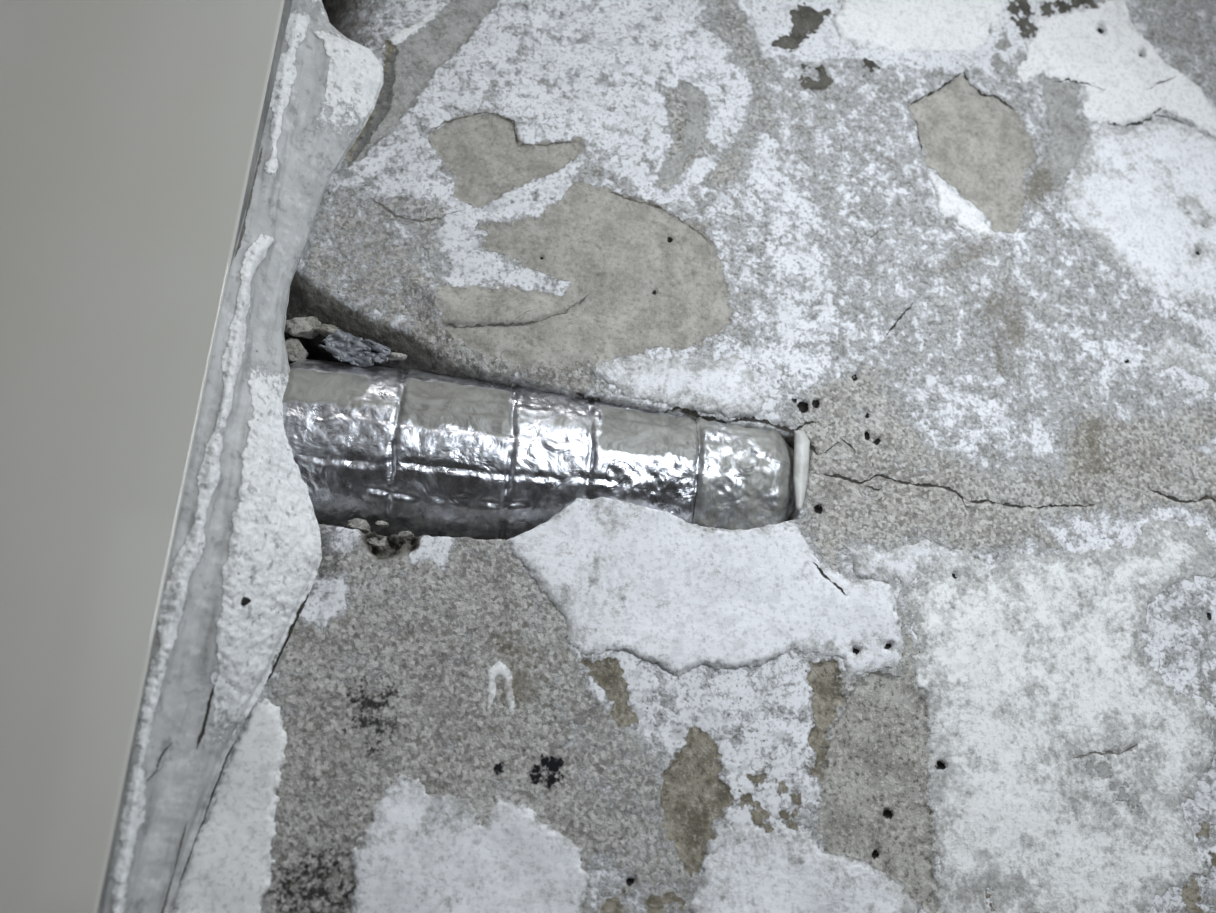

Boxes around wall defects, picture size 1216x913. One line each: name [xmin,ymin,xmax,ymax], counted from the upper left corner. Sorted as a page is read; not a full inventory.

peeling [344,0,497,168]
peeling [771,0,1216,312]
peeling [428,113,765,420]
crack [570,390,601,402]
crack [665,406,1094,513]
crack [1152,490,1216,503]
peeling [487,661,516,716]
peeling [509,497,1216,913]
peeling [345,774,590,913]